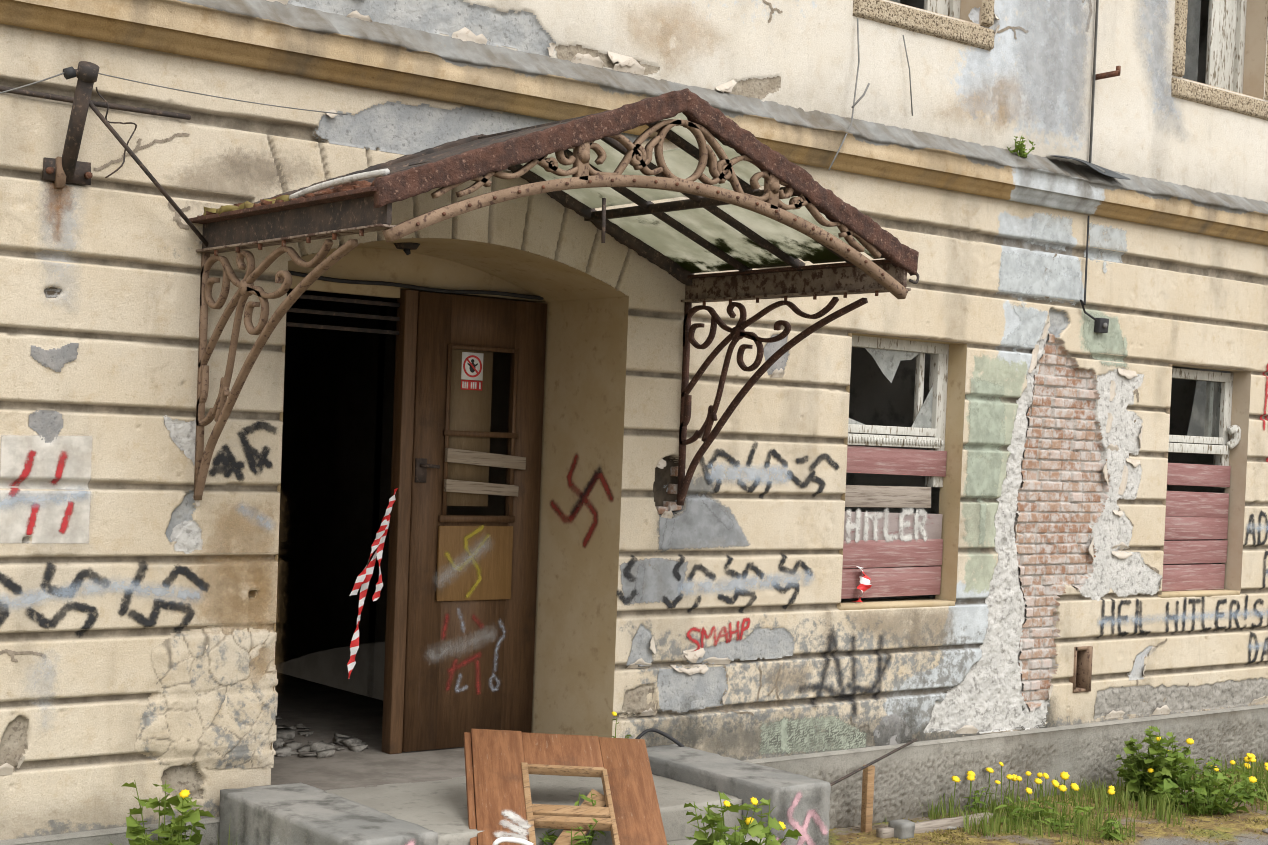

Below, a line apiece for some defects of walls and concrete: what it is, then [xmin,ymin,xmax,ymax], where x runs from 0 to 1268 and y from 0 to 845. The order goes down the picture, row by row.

flaking render [267,0,660,75]
flaking render [313,101,555,155]
flaking render [163,415,196,466]
flaking render [165,490,203,554]
flaking render [873,308,1163,746]
flaking render [622,624,795,716]
flaking render [1094,646,1268,719]
flaking render [0,715,29,776]